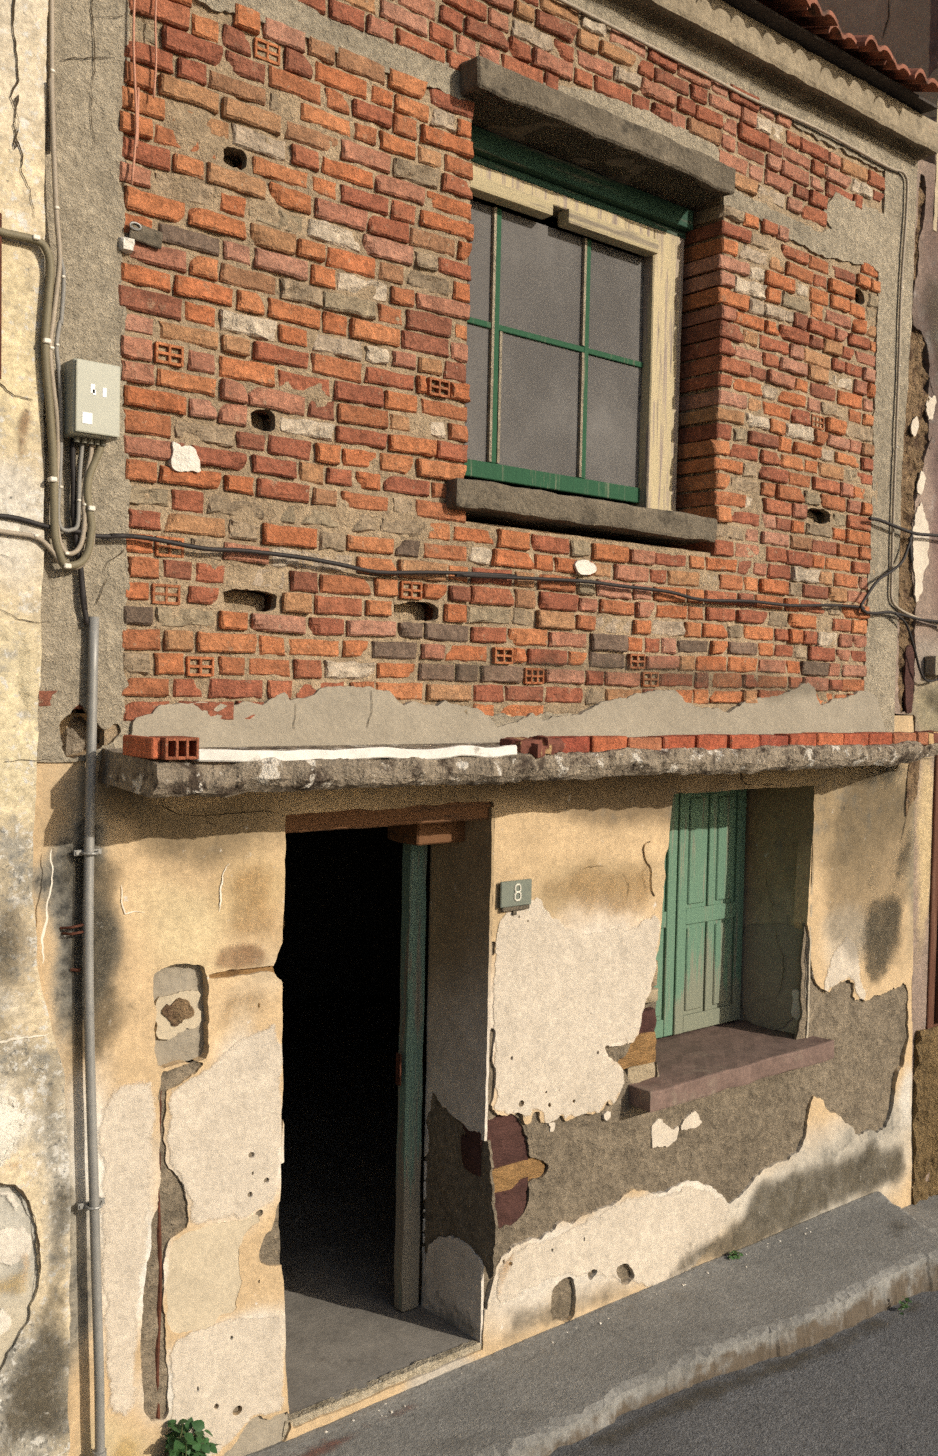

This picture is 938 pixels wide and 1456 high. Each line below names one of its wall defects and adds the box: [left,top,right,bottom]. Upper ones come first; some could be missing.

crack [10,0,35,218]
crack [62,0,125,143]
spalling [913,179,926,281]
spalling [898,329,937,713]
leakage [880,766,901,778]
flaking render [643,842,666,896]
leakage [865,899,901,981]
spalling [424,923,907,1308]
leakage [679,1145,905,1271]
spalling [0,1184,38,1366]
spalling [550,1269,594,1321]
leakage [6,1326,66,1441]